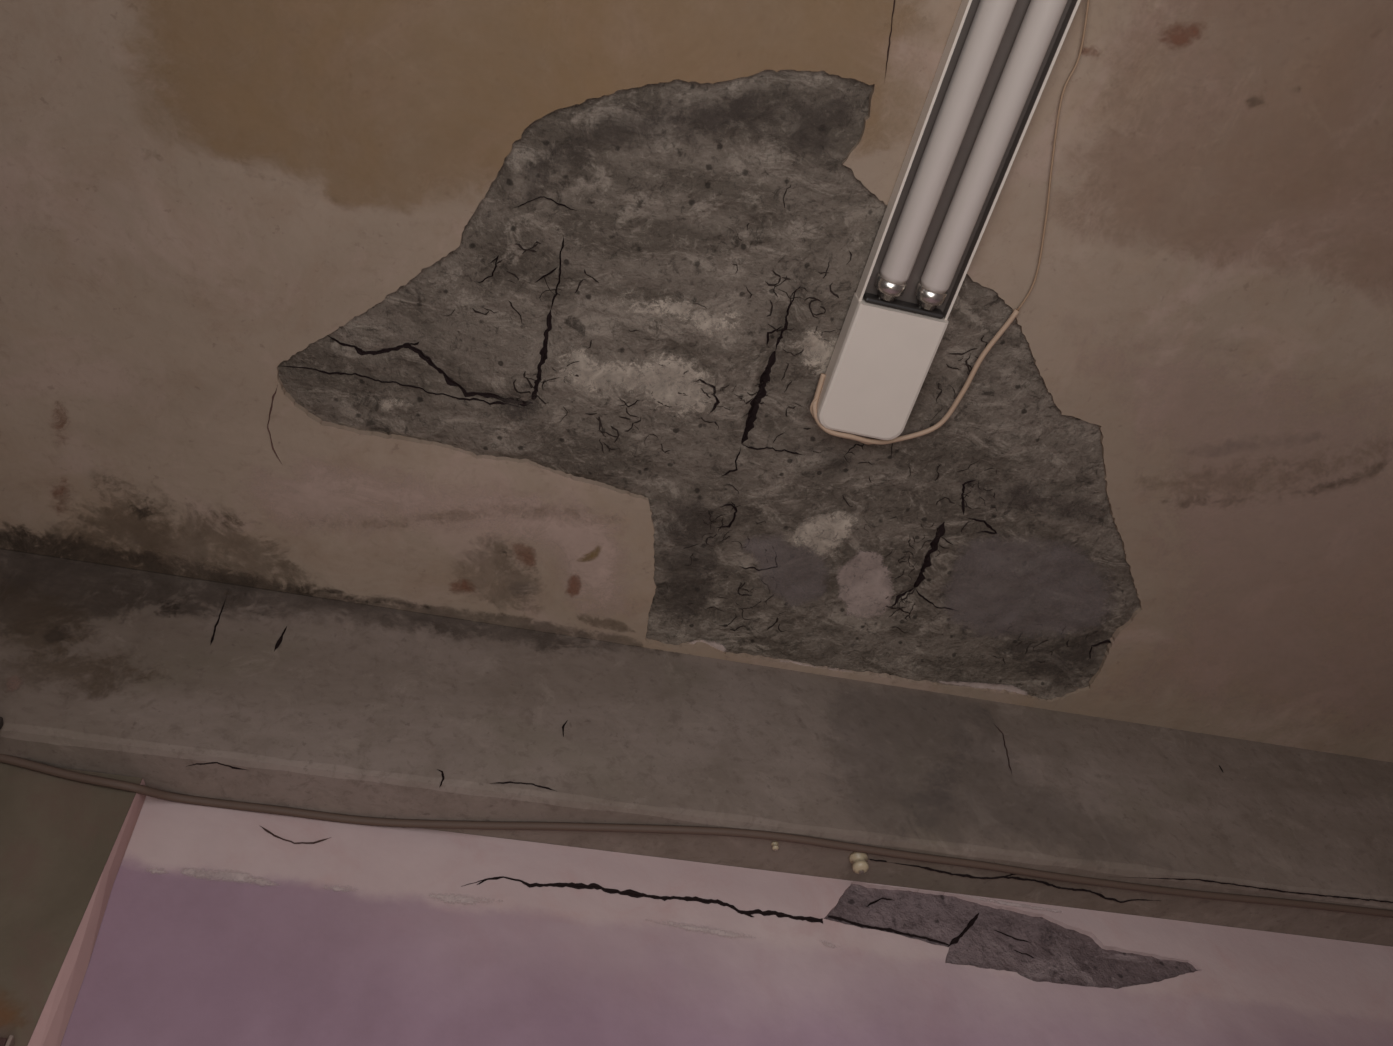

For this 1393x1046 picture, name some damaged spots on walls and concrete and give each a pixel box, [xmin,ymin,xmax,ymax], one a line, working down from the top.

crack [267,196,577,464]
flaking render [278,69,1141,700]
crack [693,285,802,528]
crack [891,480,997,611]
crack [461,876,1034,958]
flaking render [825,884,1198,989]
crack [869,859,1393,903]